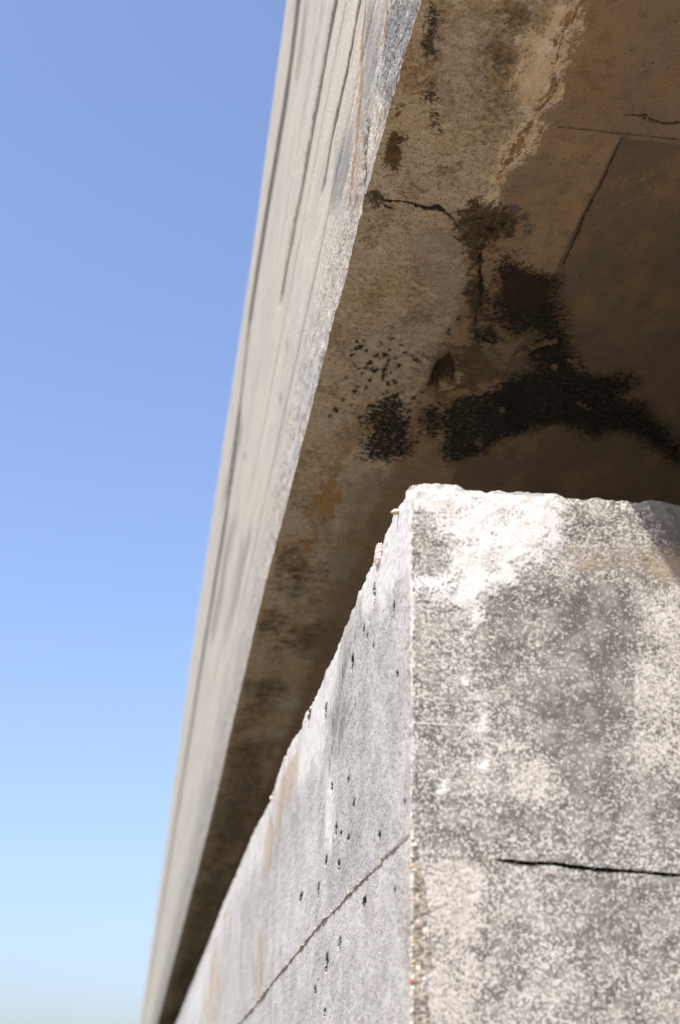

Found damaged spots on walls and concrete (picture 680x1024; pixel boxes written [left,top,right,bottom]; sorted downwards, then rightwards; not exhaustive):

crack [363,123,505,346]
leakage [331,0,680,477]
crack [417,854,678,877]